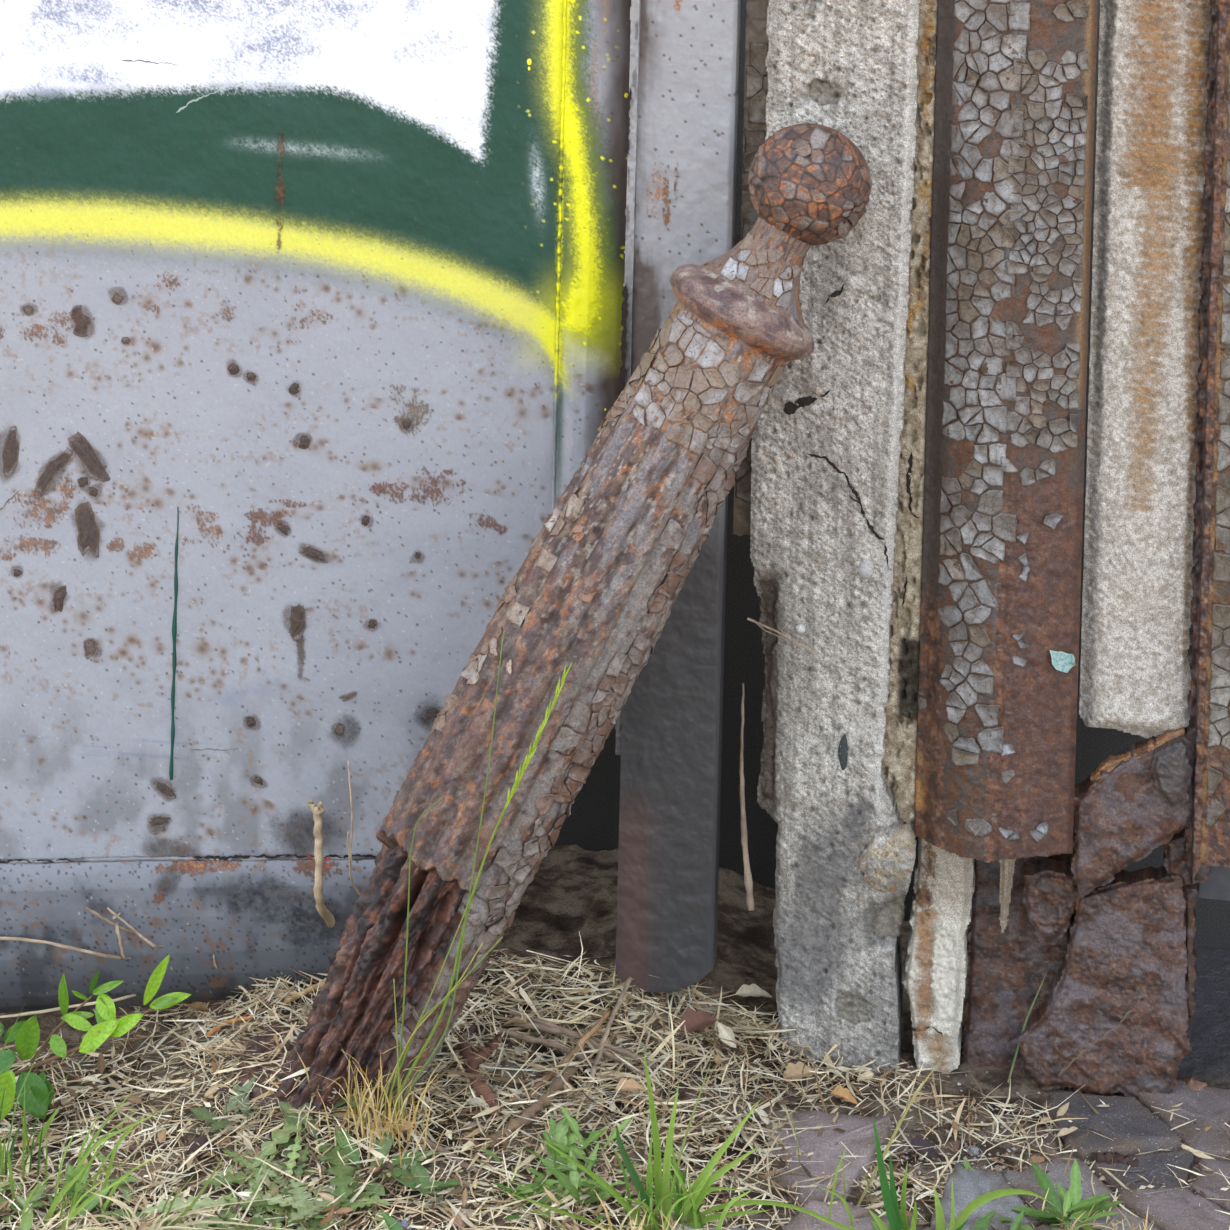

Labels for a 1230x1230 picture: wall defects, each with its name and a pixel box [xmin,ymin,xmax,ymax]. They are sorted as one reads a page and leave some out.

corrosion [24,305,92,345]
peeling [937,0,1089,766]
corrosion [1126,0,1209,548]
peeling [1213,160,1230,582]
corrosion [0,426,157,561]
corrosion [187,500,306,547]
crack [808,454,907,606]
crack [906,452,921,518]
corrosion [285,604,306,677]
peeling [1208,604,1230,750]
peeling [947,809,1049,843]
spalling [931,926,960,1021]